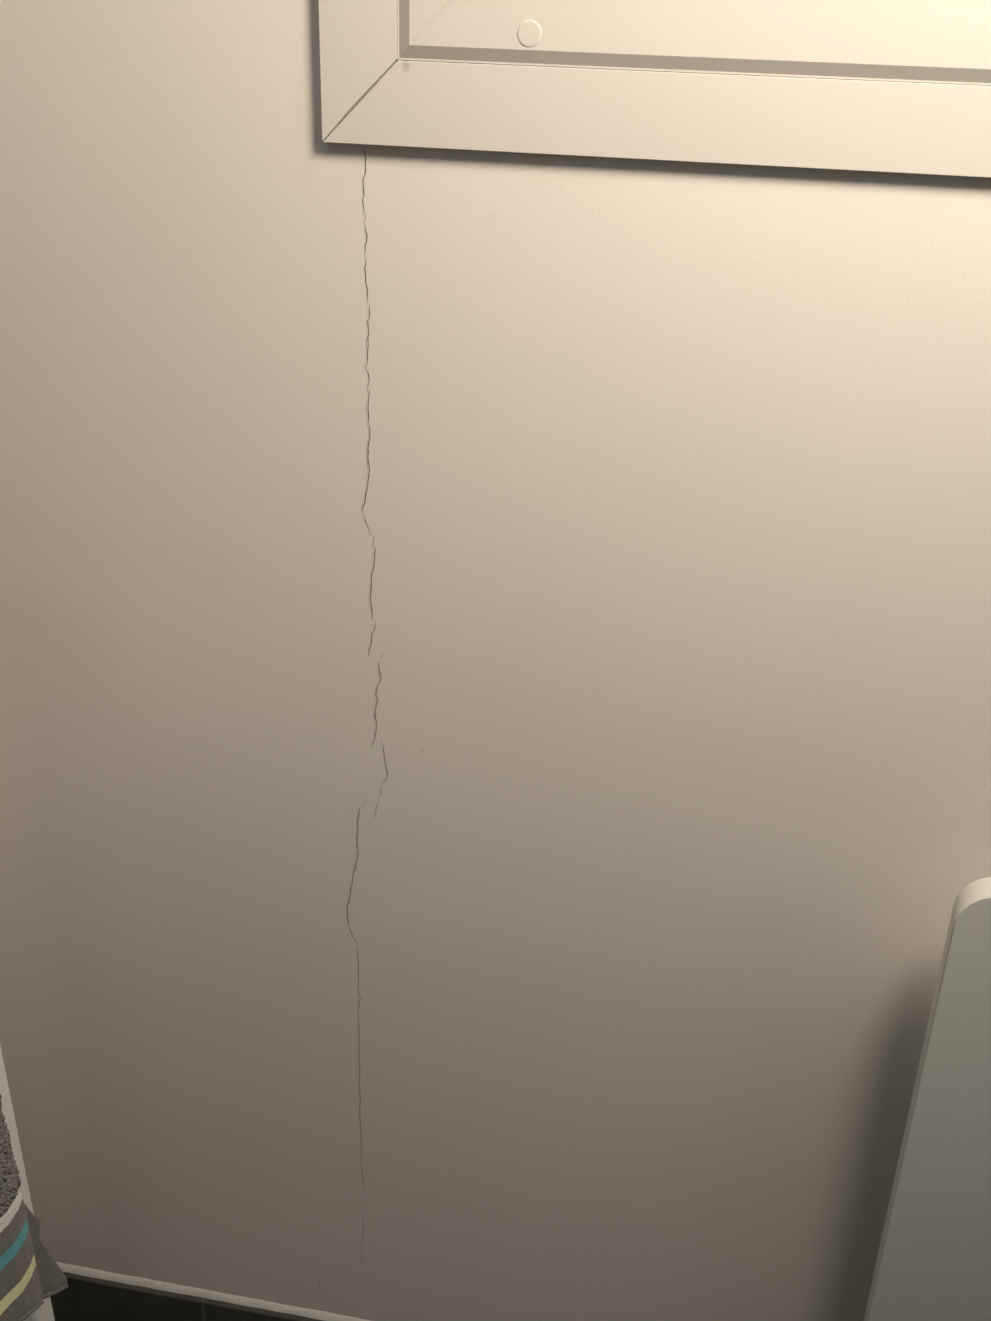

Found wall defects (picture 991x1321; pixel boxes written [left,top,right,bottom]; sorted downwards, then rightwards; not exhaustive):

crack [346,149,388,1129]